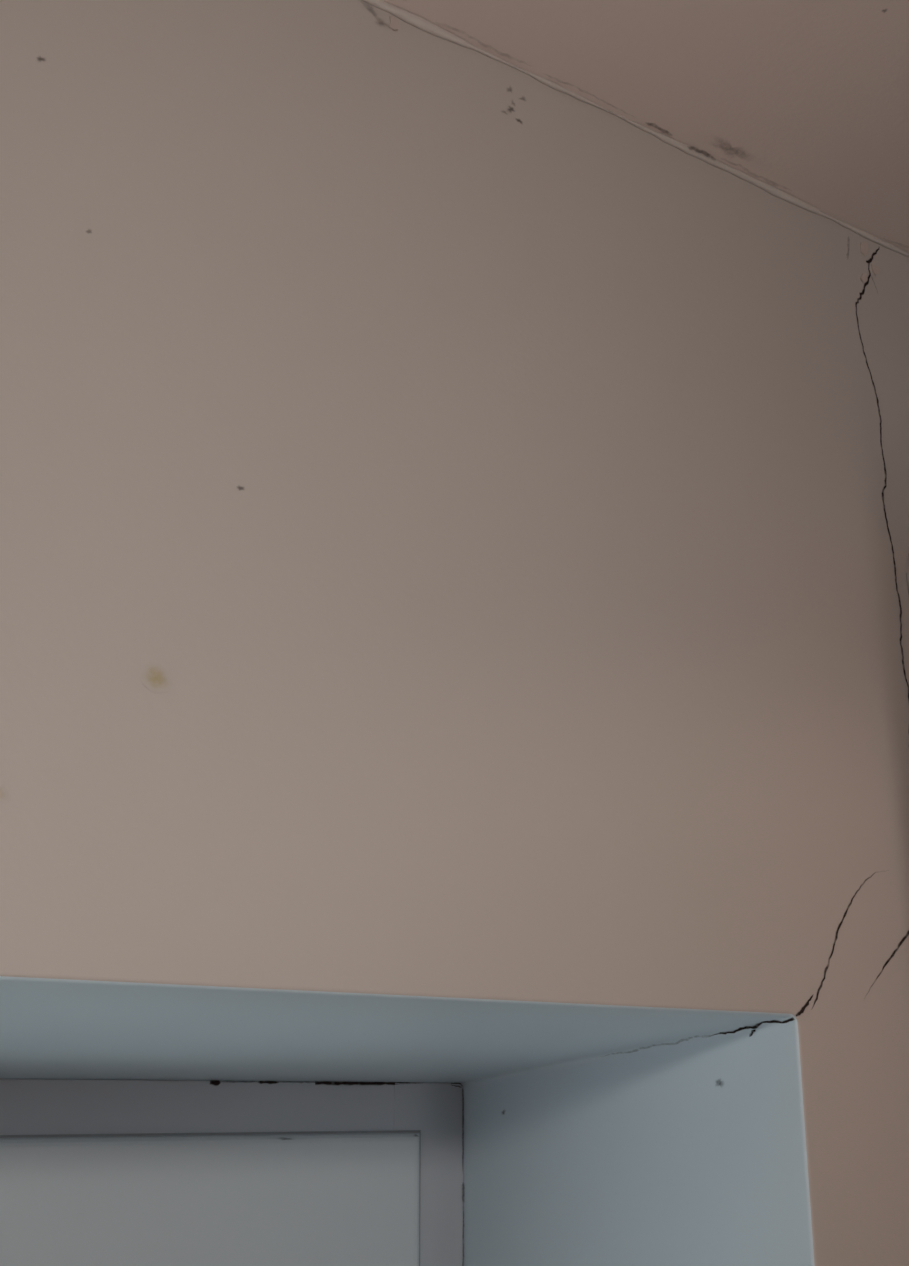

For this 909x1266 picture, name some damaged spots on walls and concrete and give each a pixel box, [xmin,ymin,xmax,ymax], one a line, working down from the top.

crack [855,241,909,700]
crack [711,872,876,1036]
crack [867,931,909,994]